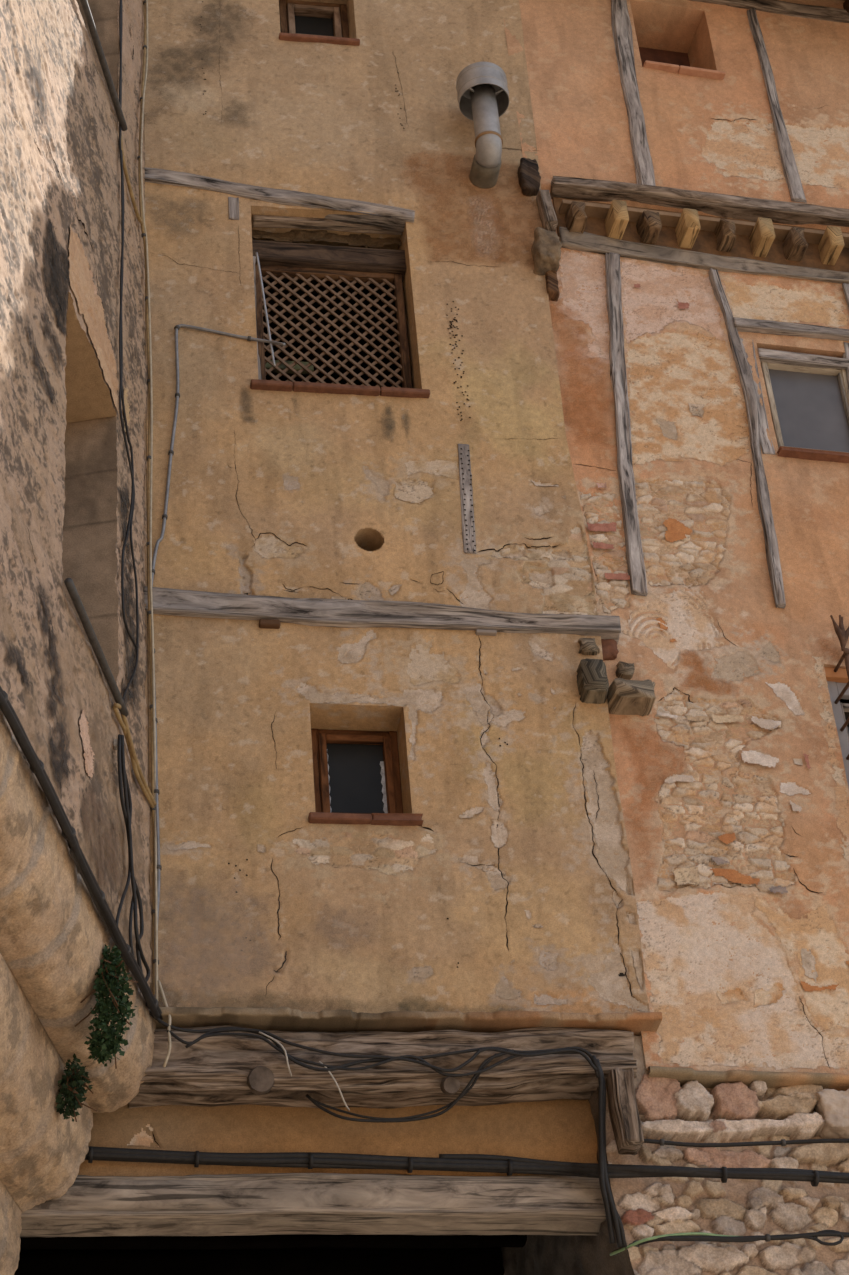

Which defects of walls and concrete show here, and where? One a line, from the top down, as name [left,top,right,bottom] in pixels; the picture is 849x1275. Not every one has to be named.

flaking render [559,250,609,360]
crack [228,428,308,547]
flaking render [363,459,458,504]
crack [479,537,558,552]
flaking render [460,479,630,615]
flaking render [621,261,848,588]
crack [265,828,301,998]
crack [468,636,509,951]
crack [573,702,635,998]
flaking render [580,682,849,1070]